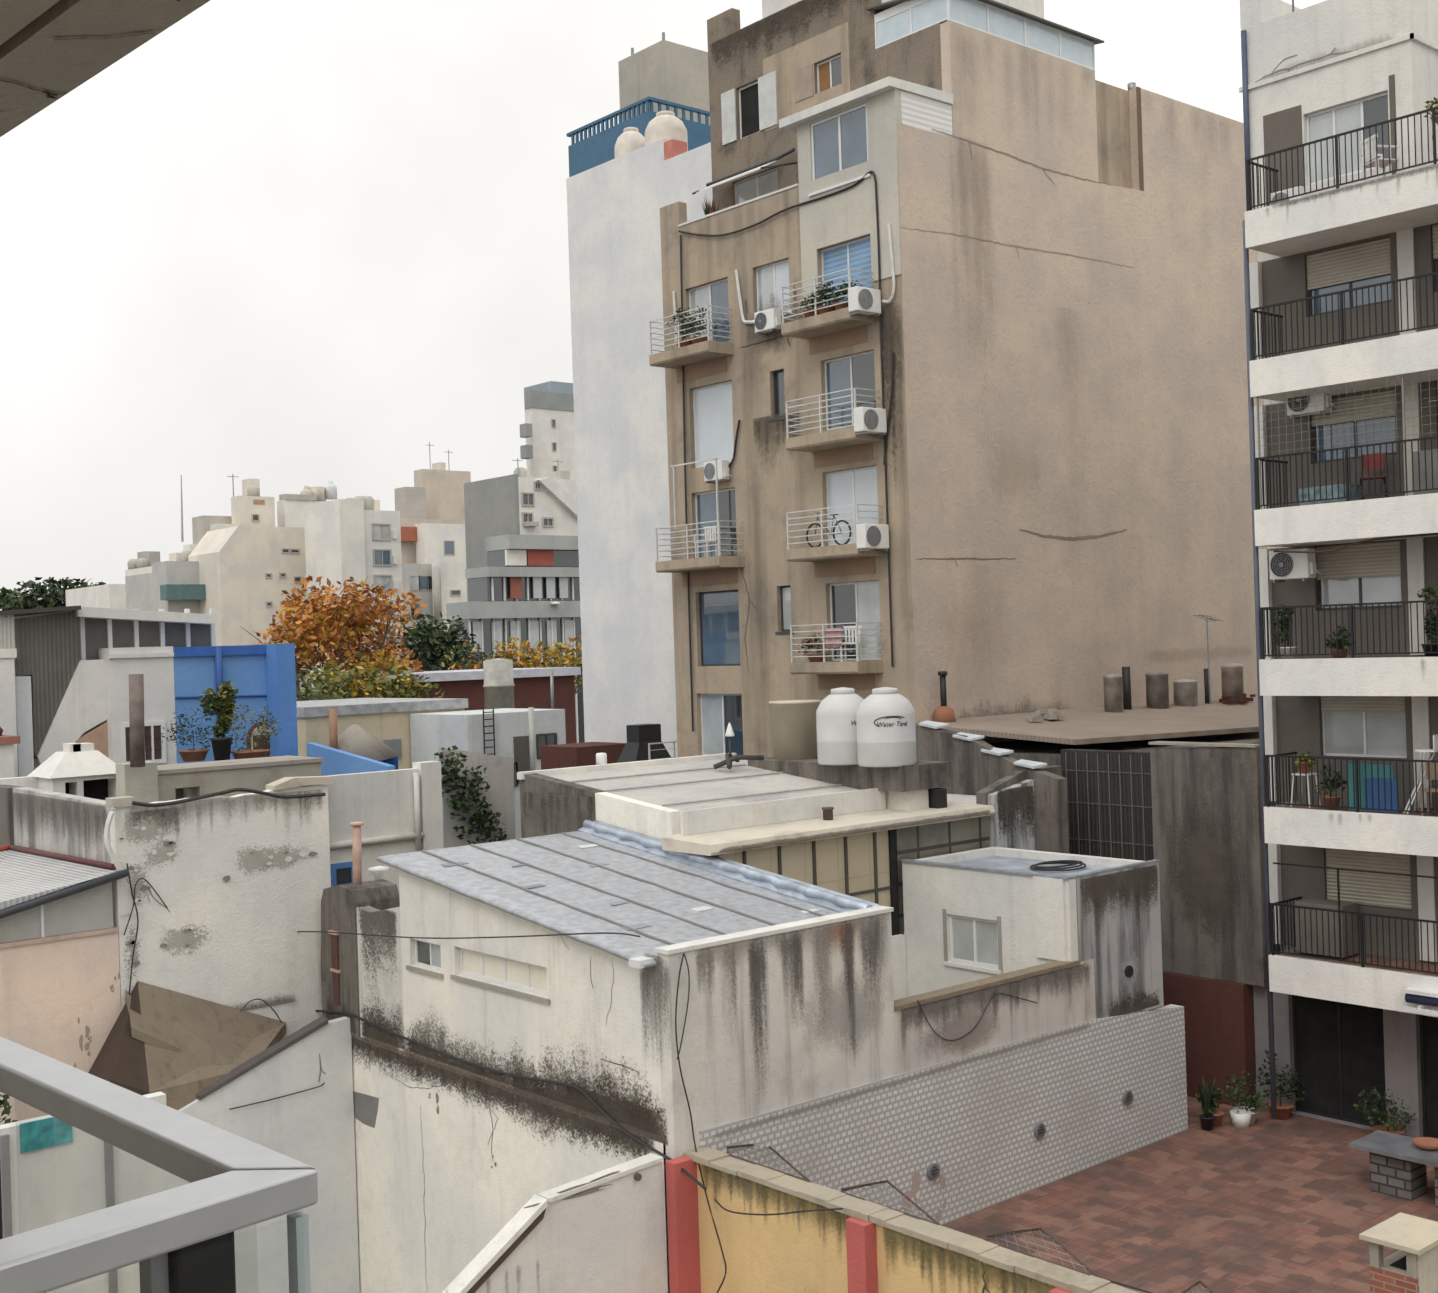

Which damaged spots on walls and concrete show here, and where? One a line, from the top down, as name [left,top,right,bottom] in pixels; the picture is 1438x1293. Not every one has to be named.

crack [932,129,1113,186]
crack [899,227,1134,268]
peeling [222,845,318,883]
peeling [110,814,177,992]
peeling [160,924,209,955]
water stain [750,946,767,1044]
water stain [782,935,802,993]
water stain [820,921,881,1038]
water stain [1109,957,1159,1017]
water stain [325,905,670,1159]
water stain [920,1245,1039,1293]